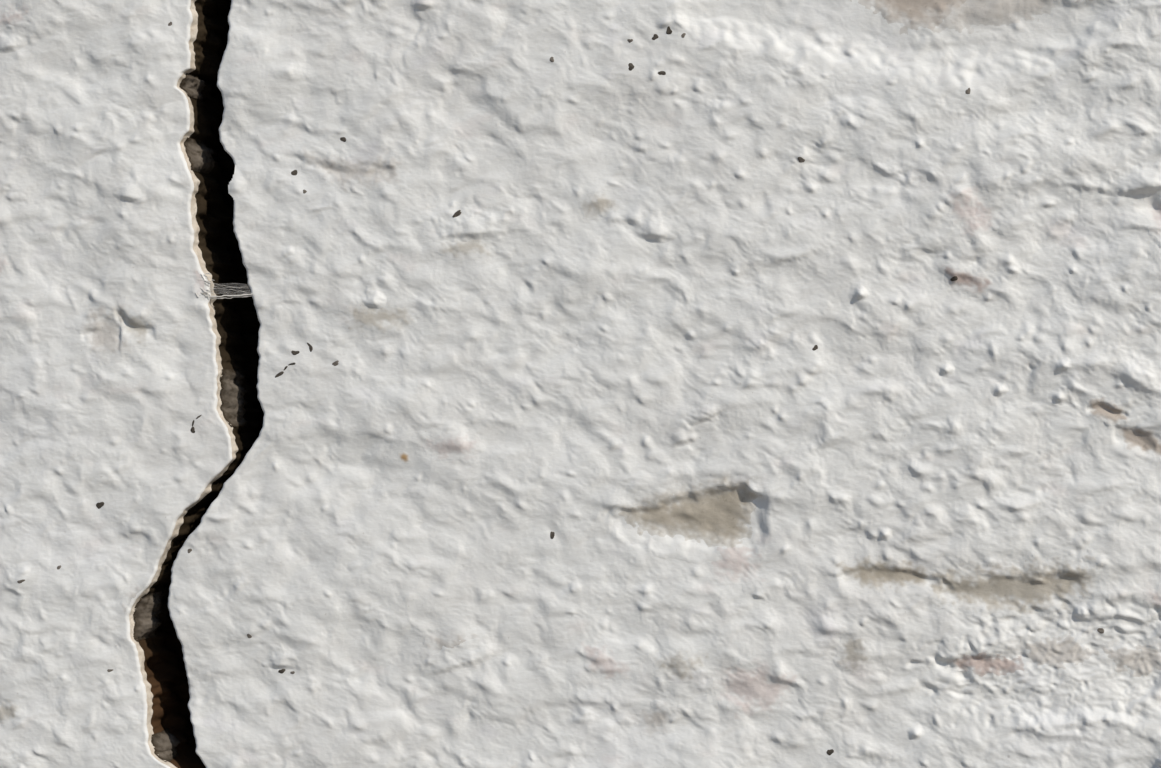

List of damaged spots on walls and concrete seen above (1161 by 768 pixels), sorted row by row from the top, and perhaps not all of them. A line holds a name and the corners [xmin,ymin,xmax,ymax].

flaking render [666,0,1133,105]
crack [129,0,264,768]
flaking render [608,468,772,566]